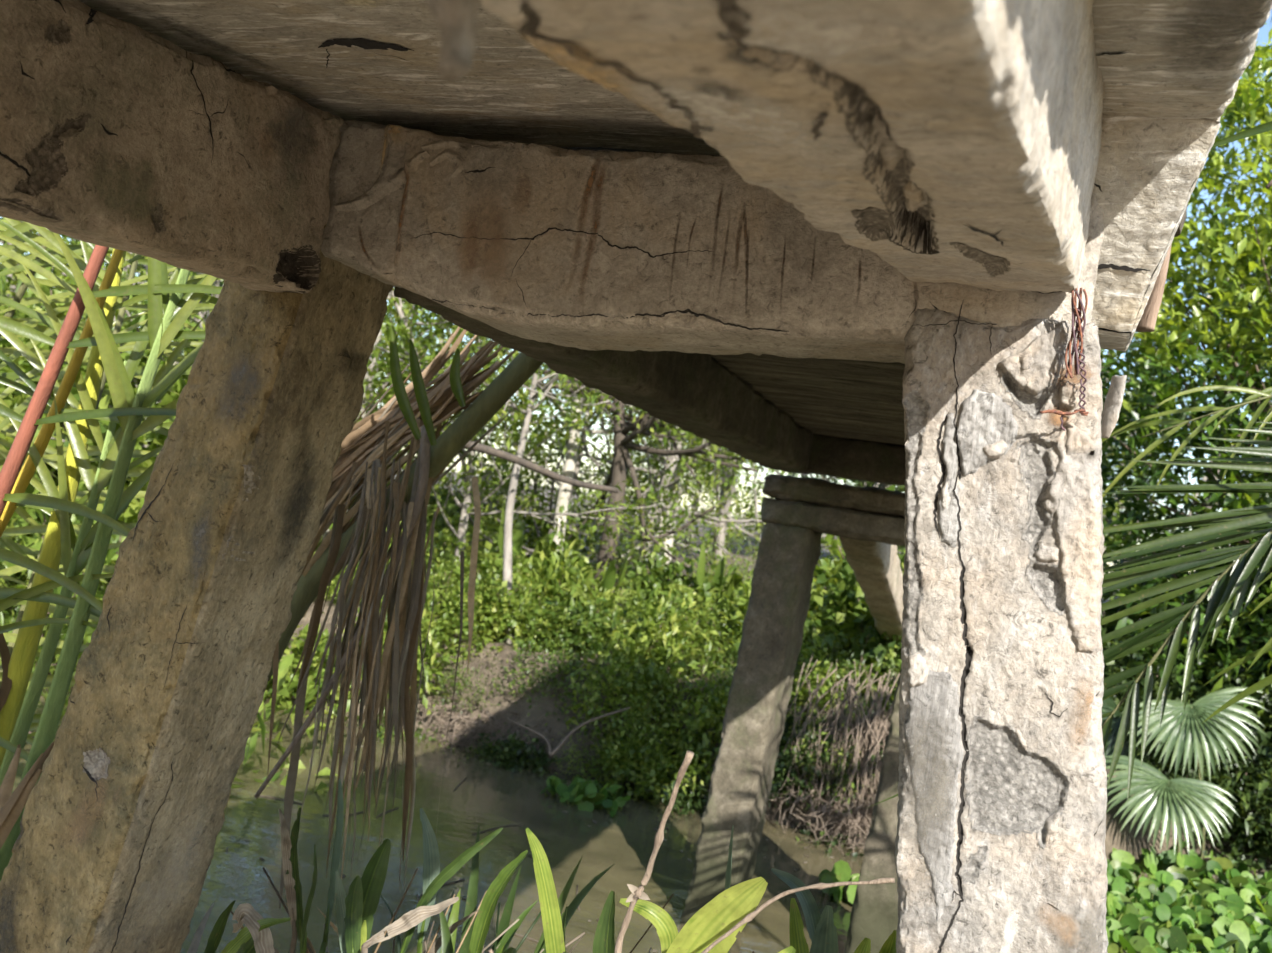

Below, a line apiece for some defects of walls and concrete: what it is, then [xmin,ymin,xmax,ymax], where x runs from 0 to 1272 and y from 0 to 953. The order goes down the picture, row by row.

crack [318,38,414,66]
crack [519,2,714,140]
crack [717,0,752,44]
crack [0,152,30,185]
crack [810,113,828,140]
spalling [266,245,321,294]
crack [415,227,789,332]
peeling [938,320,1127,654]
crack [909,303,997,953]
spalling [902,390,1070,922]
crack [111,759,174,953]